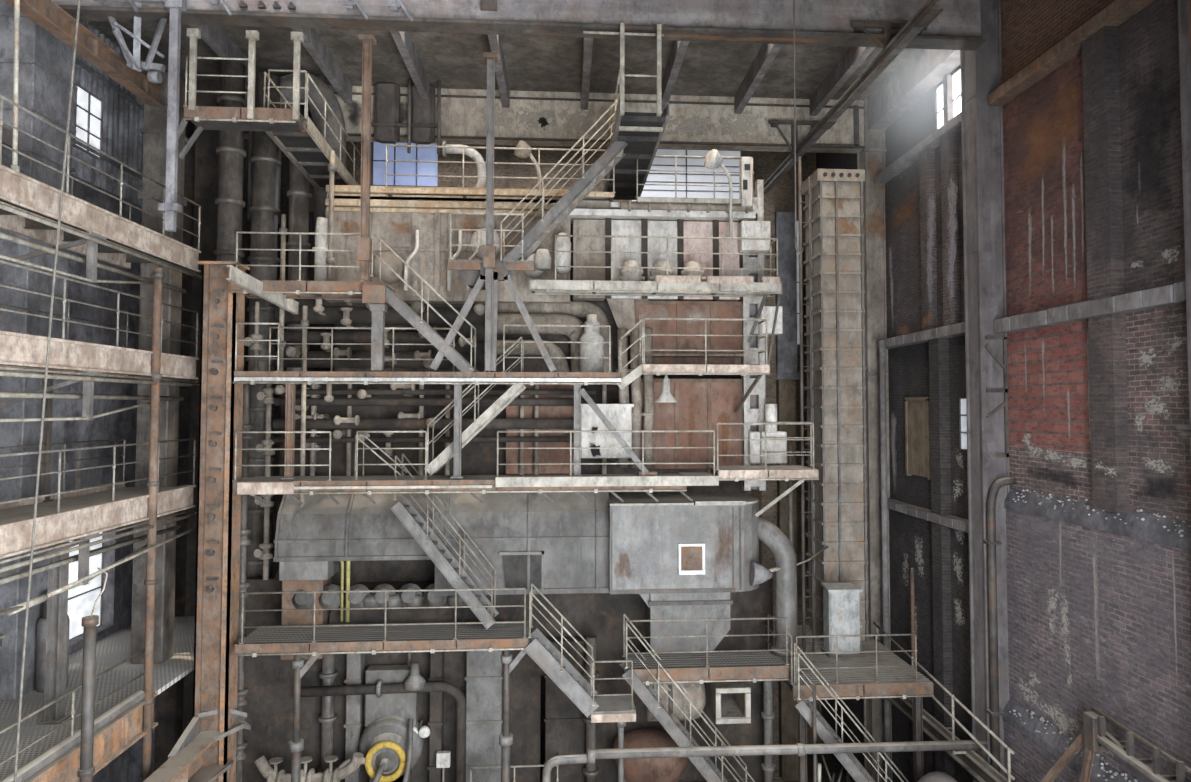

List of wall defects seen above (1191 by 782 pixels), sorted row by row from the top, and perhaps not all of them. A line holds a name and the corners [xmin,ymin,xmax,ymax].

water stain [926,178,958,306]
efflorescence [1028,145,1083,288]
efflorescence [1134,336,1187,432]
efflorescence [1137,456,1177,475]